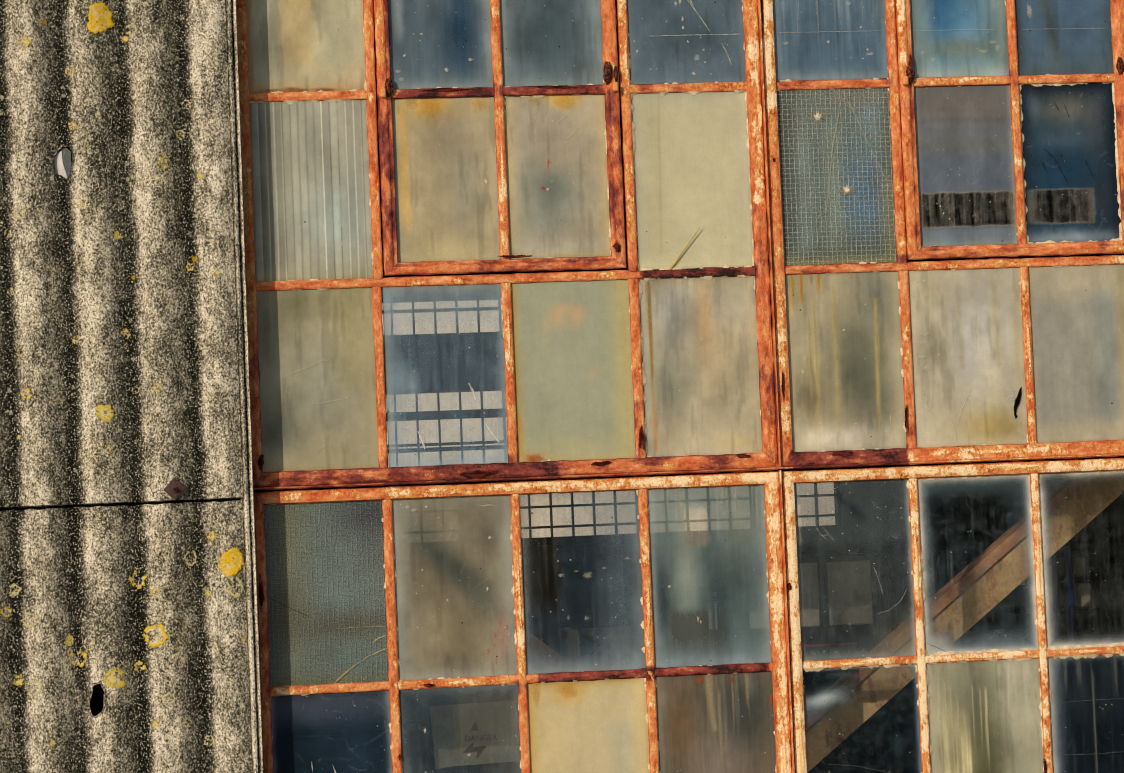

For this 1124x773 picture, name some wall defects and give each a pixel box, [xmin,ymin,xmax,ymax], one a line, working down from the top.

spalling [90,683,104,716]
peeling [781,715,804,773]